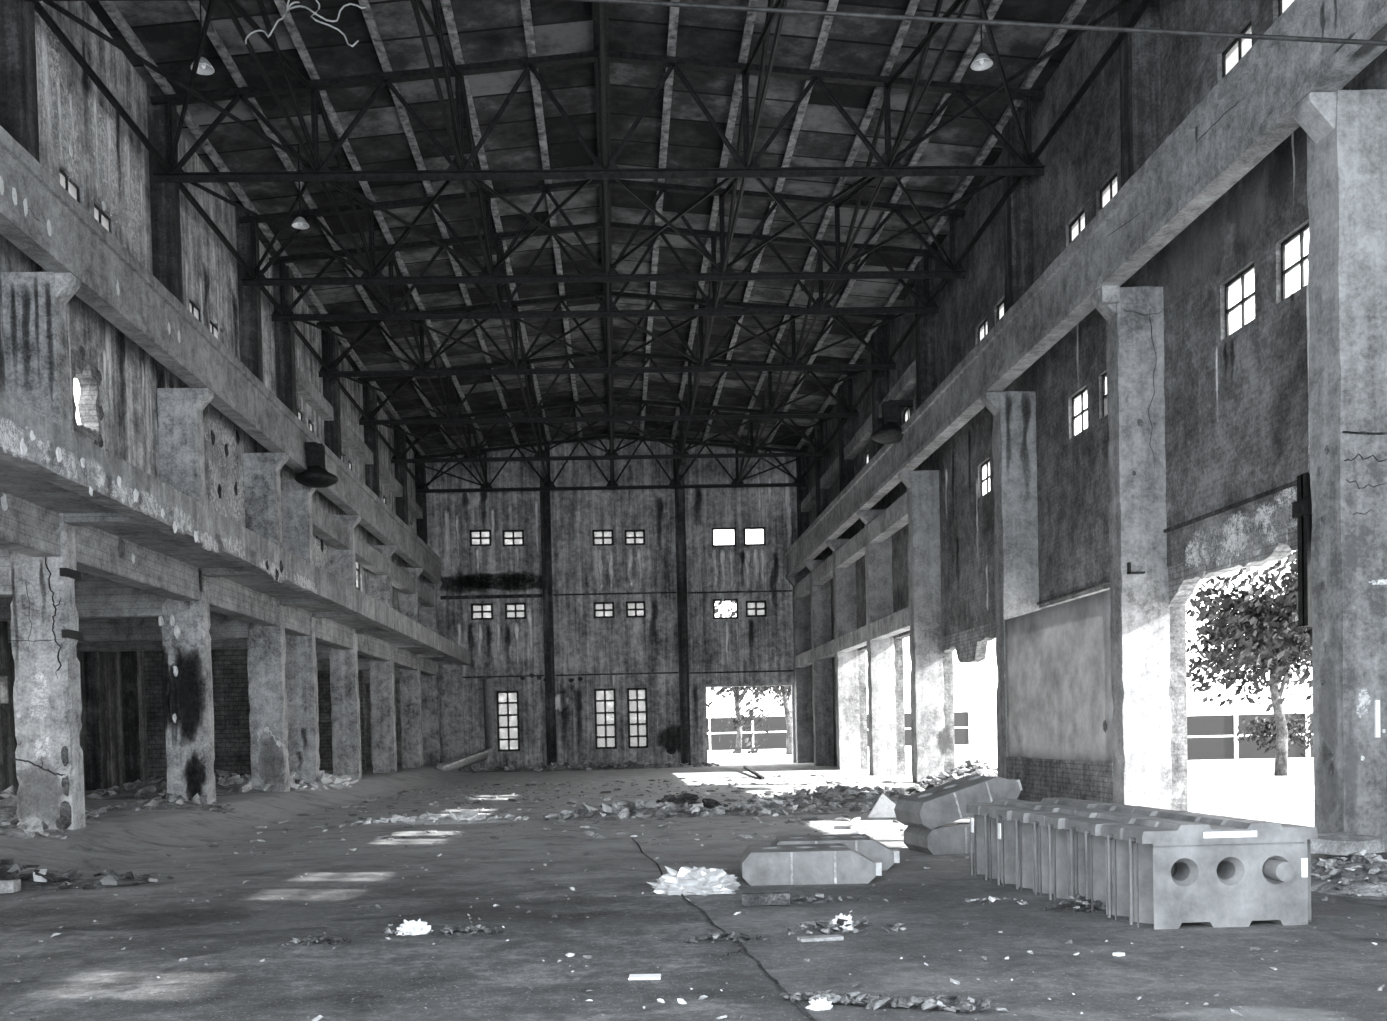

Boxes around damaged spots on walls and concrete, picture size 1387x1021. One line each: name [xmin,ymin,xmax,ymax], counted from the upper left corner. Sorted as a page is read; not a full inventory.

spalling [158,615,180,639]
spalling [1168,488,1298,607]
flaking render [16,668,72,830]
crack [632,839,817,1021]